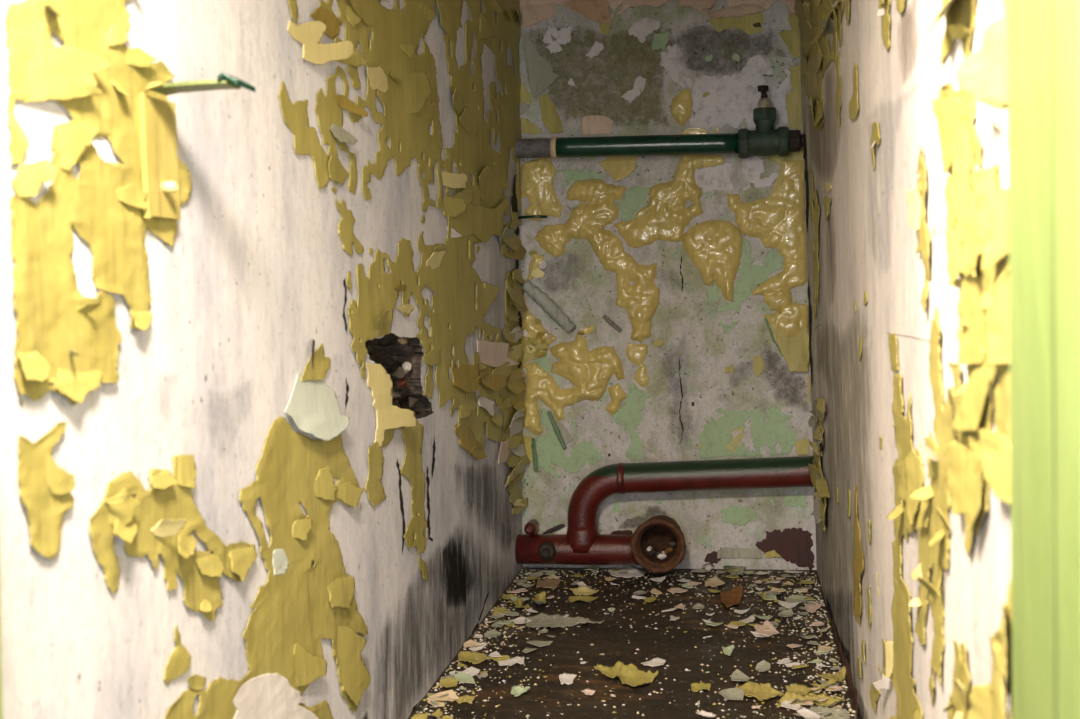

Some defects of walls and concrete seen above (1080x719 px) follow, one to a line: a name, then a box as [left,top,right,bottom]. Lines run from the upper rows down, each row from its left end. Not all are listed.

water stain [533,28,782,125]
peeling [5,0,177,406]
peeling [89,0,859,719]
crack [677,359,685,441]
peeling [18,422,75,560]
water stain [468,467,511,542]